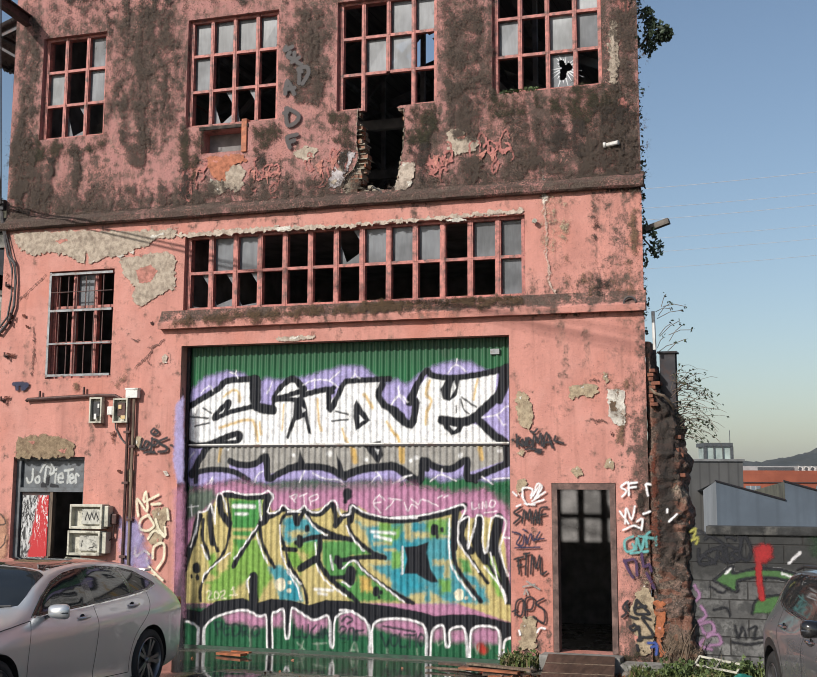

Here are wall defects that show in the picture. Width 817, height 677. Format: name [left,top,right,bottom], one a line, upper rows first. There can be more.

water stain [7,0,370,219]
water stain [388,0,648,191]
peeling [206,153,247,195]
flaking render [328,108,372,193]
spalling [394,108,415,190]
peeling [425,129,514,182]
peeling [14,207,524,307]
peeling [515,391,533,430]
spalling [568,372,626,426]
peeling [14,434,75,460]
peeling [629,586,666,657]